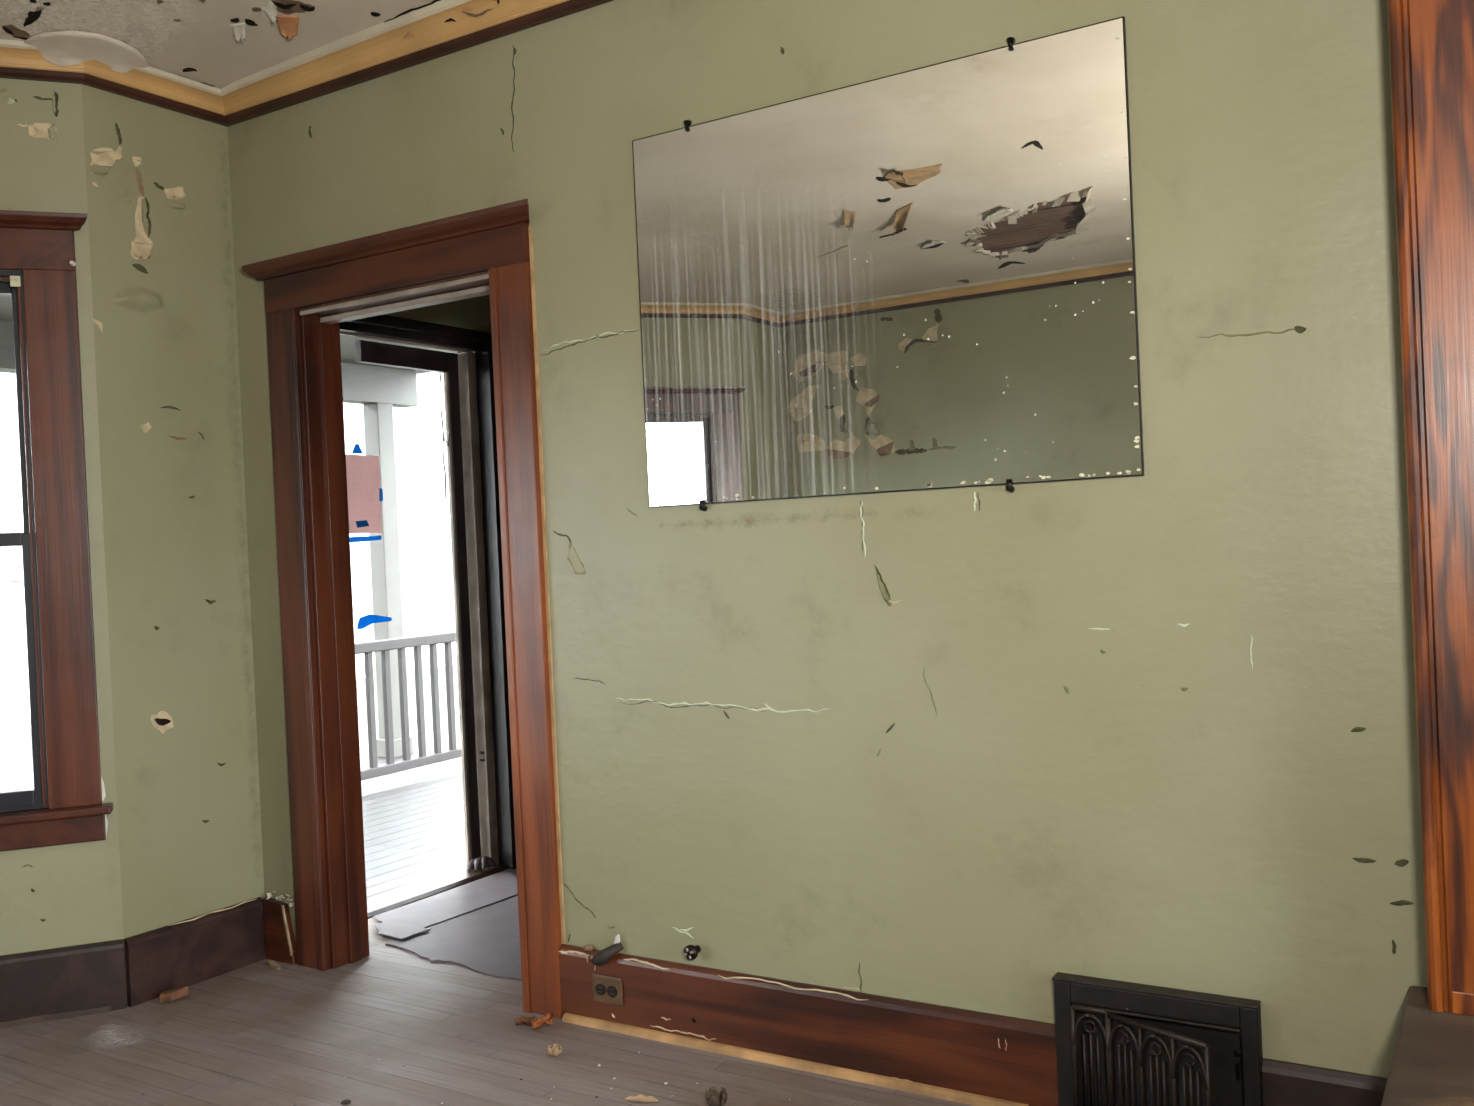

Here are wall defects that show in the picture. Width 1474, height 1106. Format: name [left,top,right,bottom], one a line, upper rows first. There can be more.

peeling [2,0,51,40]
peeling [229,0,315,43]
peeling [444,0,499,23]
peeling [17,91,59,140]
crack [500,45,516,152]
peeling [90,123,186,274]
crack [574,678,823,719]
spalling [151,711,174,734]